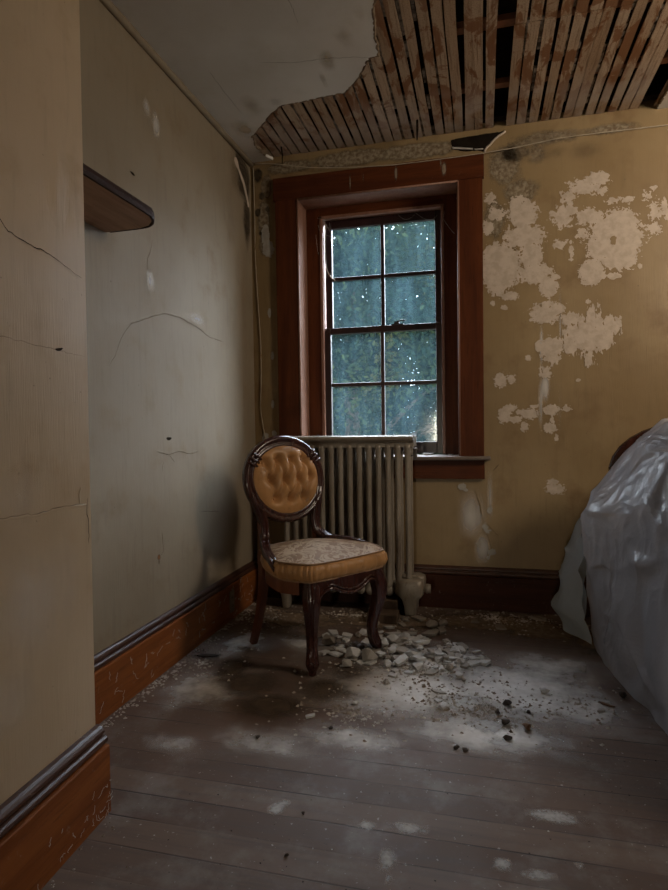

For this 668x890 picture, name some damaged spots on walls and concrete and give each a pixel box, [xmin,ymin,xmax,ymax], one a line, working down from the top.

spalling [251,0,668,164]
peeling [483,170,668,380]
crack [108,312,223,366]
peeling [493,372,516,389]
peeling [497,403,573,441]